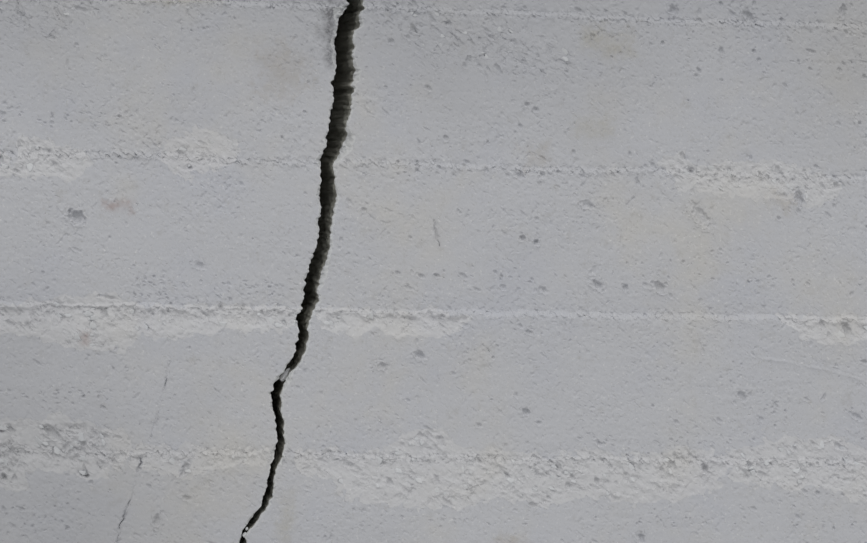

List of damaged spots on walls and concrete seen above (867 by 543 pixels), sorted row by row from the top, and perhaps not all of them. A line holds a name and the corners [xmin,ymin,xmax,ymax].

crack [237,0,367,543]